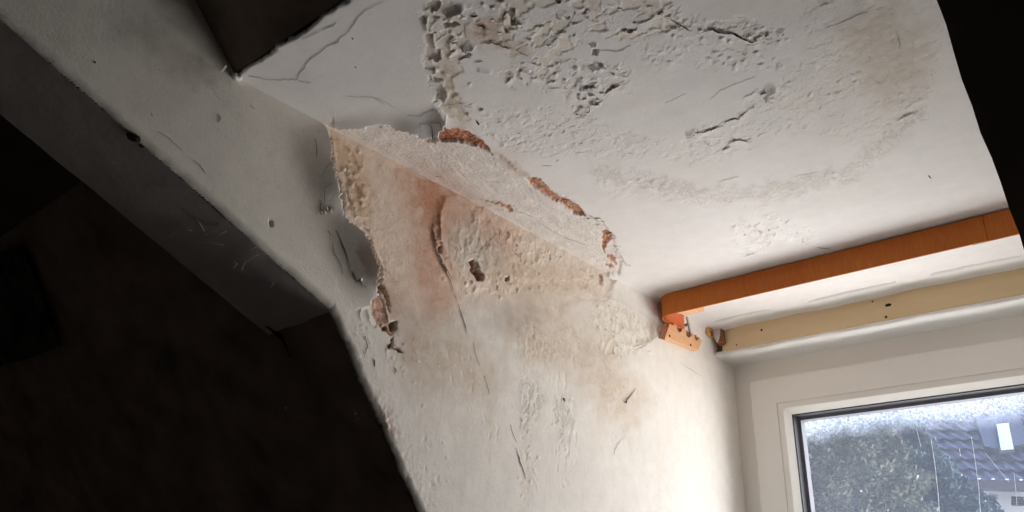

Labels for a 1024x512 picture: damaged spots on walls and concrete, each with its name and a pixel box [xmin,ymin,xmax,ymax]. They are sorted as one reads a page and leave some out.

crack [249,1,384,83]
crack [553,1,784,62]
crack [687,107,766,150]
spalling [321,0,945,366]